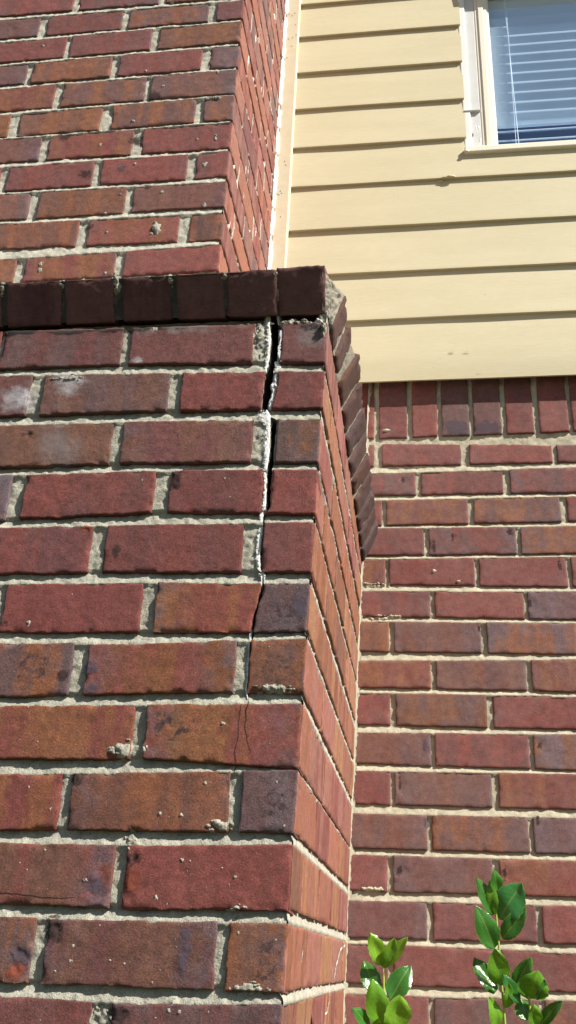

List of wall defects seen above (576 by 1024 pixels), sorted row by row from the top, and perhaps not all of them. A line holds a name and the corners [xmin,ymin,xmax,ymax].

crack [234,321,283,772]